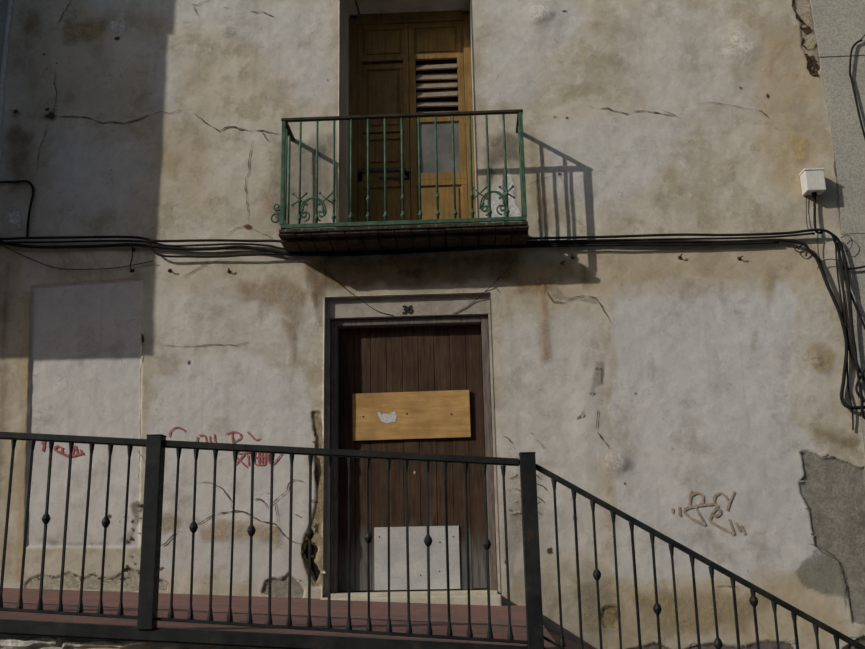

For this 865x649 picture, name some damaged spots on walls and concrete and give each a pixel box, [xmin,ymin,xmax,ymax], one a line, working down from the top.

flaking render [792,0,819,76]
crack [590,106,678,117]
crack [36,70,278,238]
crack [197,479,304,544]
spalling [261,411,326,598]
spalling [25,555,140,592]
spalling [798,450,865,649]
spalling [628,640,668,649]
spalling [689,640,795,649]